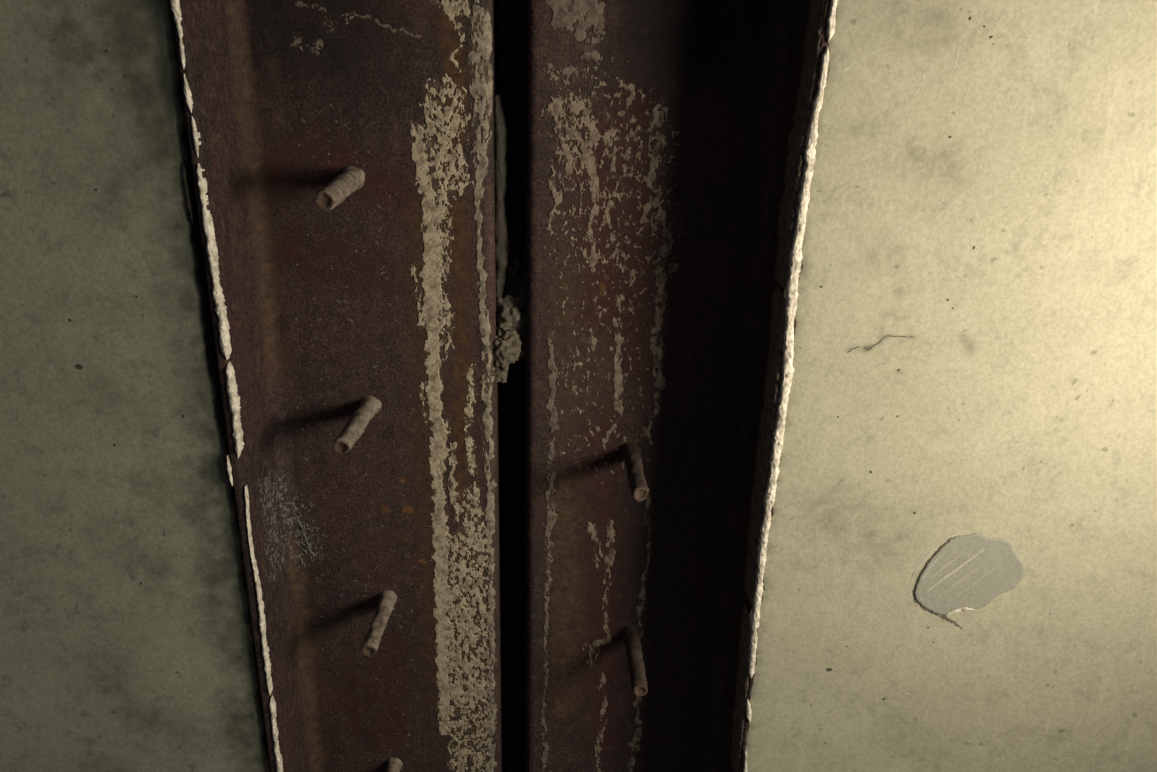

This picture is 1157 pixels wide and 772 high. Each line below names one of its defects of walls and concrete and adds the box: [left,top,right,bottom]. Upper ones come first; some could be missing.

rust [442,11,466,182]
peeling [914,533,1025,615]
rust [452,615,478,710]